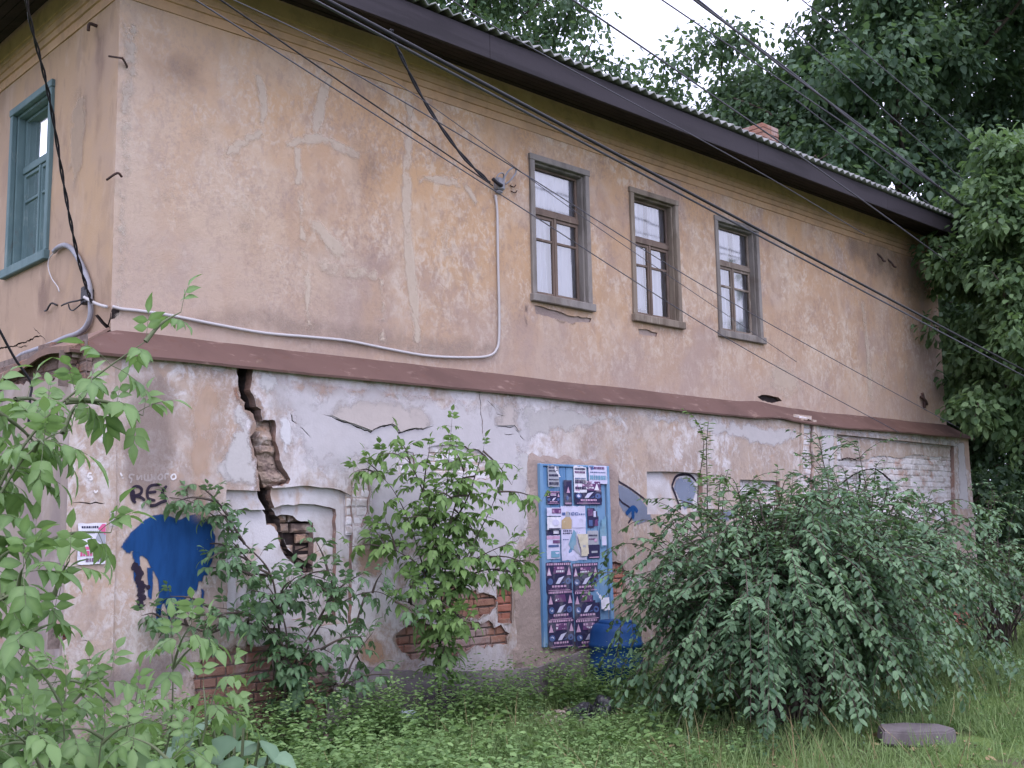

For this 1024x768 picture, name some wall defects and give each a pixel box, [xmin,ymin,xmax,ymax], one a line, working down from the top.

spalling [535,306,590,324]
crack [237,368,313,573]
peeling [218,373,529,570]
crack [326,415,432,434]
peeling [654,414,969,509]
spalling [394,585,515,661]